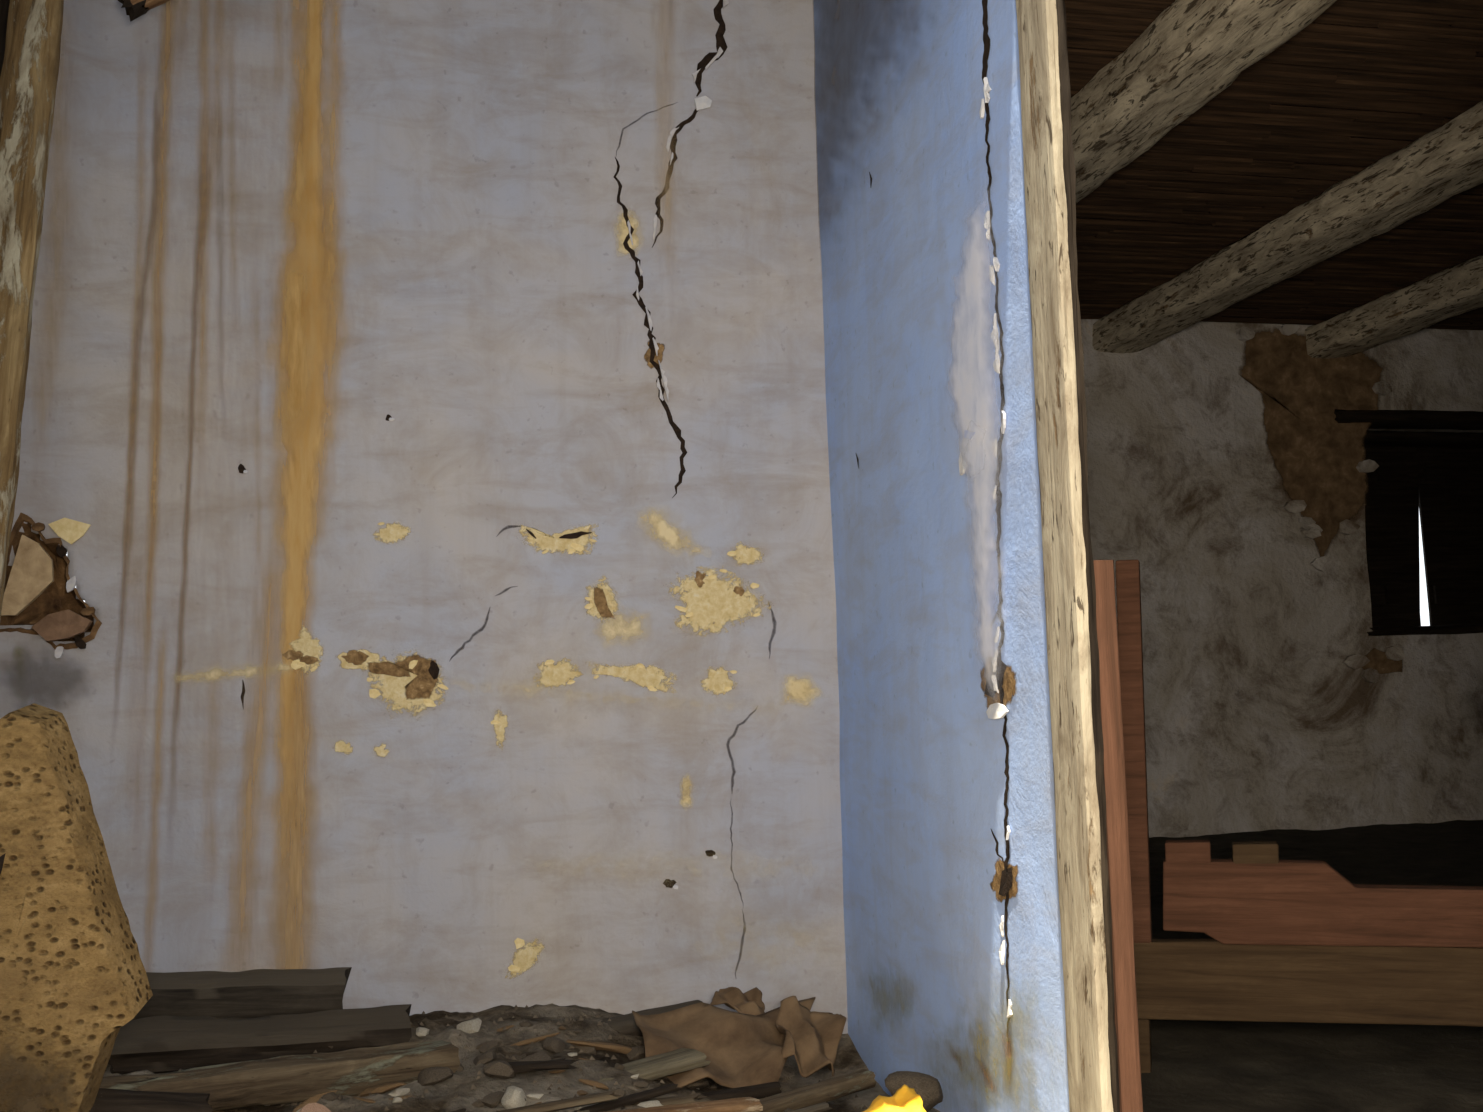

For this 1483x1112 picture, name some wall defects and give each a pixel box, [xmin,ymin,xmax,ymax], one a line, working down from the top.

crack [614,0,729,498]
spalling [0,513,102,659]
damp [184,432,192,564]
rust [239,0,337,969]
flaking render [520,525,599,555]
flaking render [649,513,771,636]
crack [979,0,1018,1038]
flaking render [278,627,448,716]
flaking render [534,659,677,693]
crack [727,707,757,976]